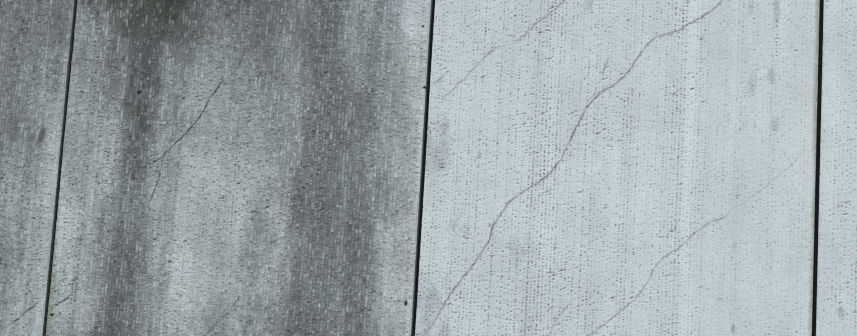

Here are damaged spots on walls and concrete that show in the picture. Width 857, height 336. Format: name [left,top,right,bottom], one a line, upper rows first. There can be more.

efflorescence [390,0,429,71]
damp [93,157,148,336]
damp [308,124,366,336]